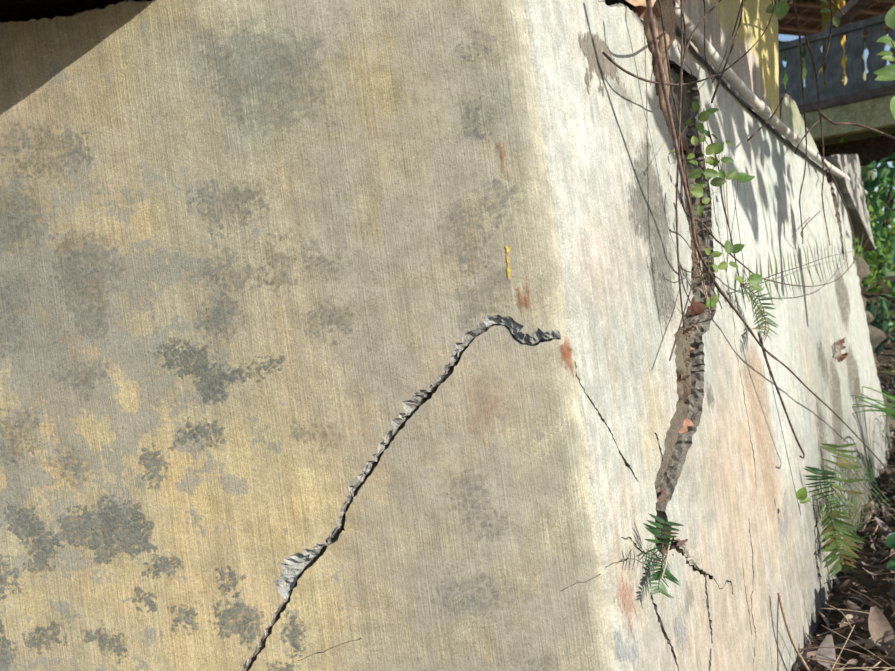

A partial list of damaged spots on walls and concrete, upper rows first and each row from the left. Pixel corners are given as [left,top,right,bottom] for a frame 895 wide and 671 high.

crack [243,314,561,671]
corrosion [561,339,574,376]
damp [628,126,676,330]
crack [561,56,757,671]